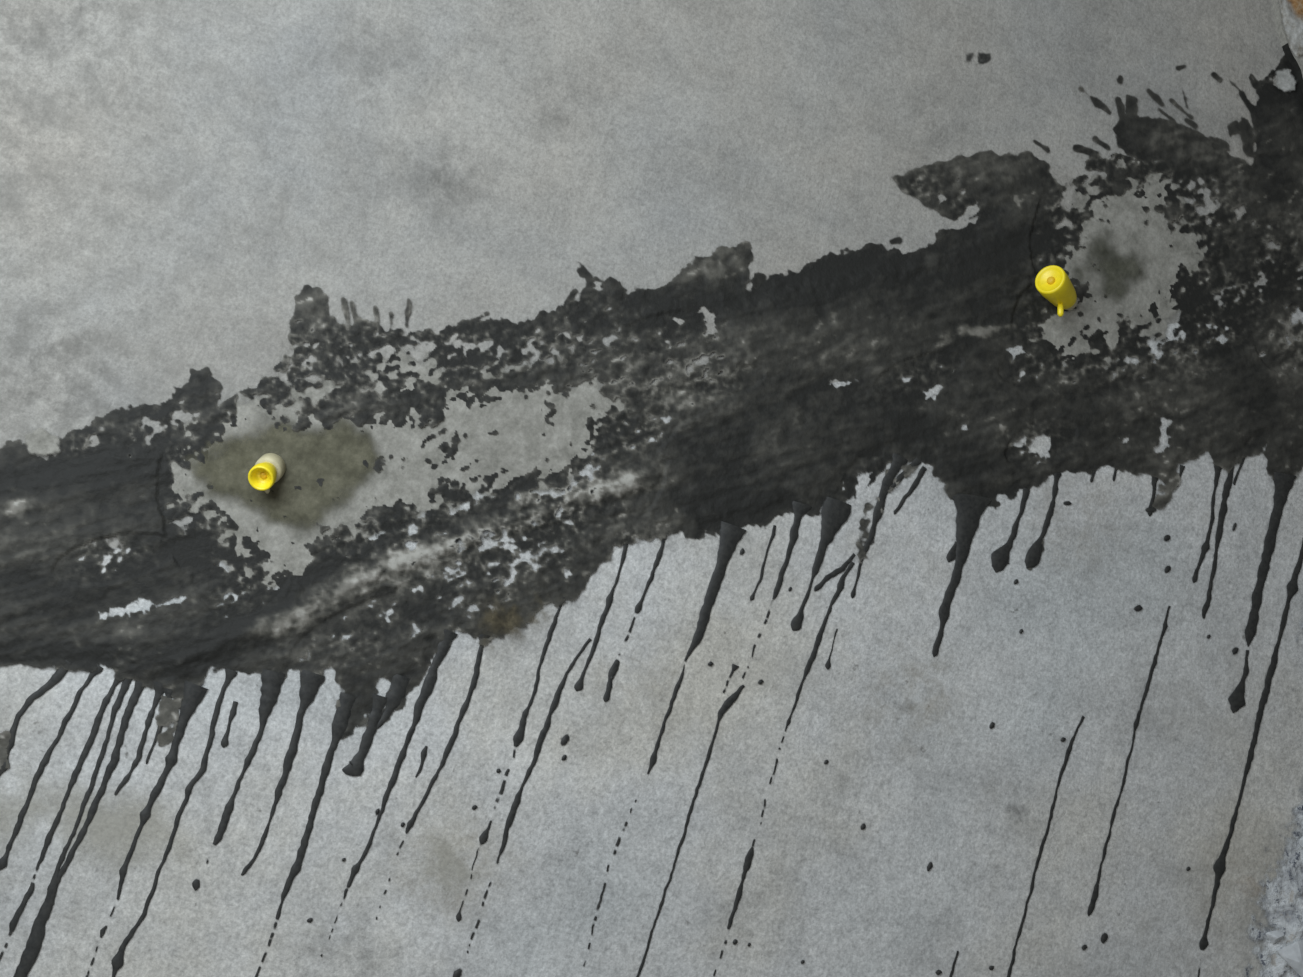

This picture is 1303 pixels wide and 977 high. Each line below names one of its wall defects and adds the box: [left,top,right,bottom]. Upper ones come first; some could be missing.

flaking render [1279,0,1303,57]
leakage [0,54,1303,834]
leakage [0,664,144,977]
leakage [111,668,238,977]
leakage [241,669,325,876]
leakage [273,692,357,929]
leakage [343,629,458,899]
leakage [636,610,770,977]
leakage [989,716,1085,977]
leakage [1087,606,1171,916]
leakage [1199,540,1303,950]
spalling [1246,788,1303,977]